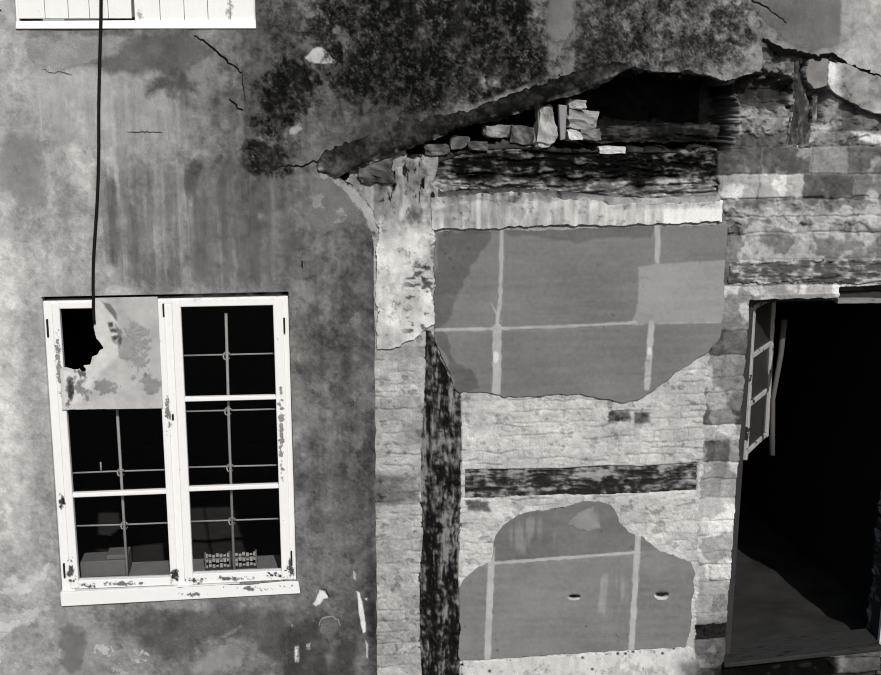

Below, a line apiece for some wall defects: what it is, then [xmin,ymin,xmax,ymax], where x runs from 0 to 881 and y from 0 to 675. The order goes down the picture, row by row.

crack [194,35,246,111]
damp [306,0,548,112]
damp [575,0,761,76]
crack [751,0,787,23]
crack [762,38,881,77]
damp [0,35,211,204]
damp [101,2,316,285]
spalling [304,172,377,235]
peeling [313,588,329,606]
spalling [319,615,341,640]
peeling [357,591,368,658]